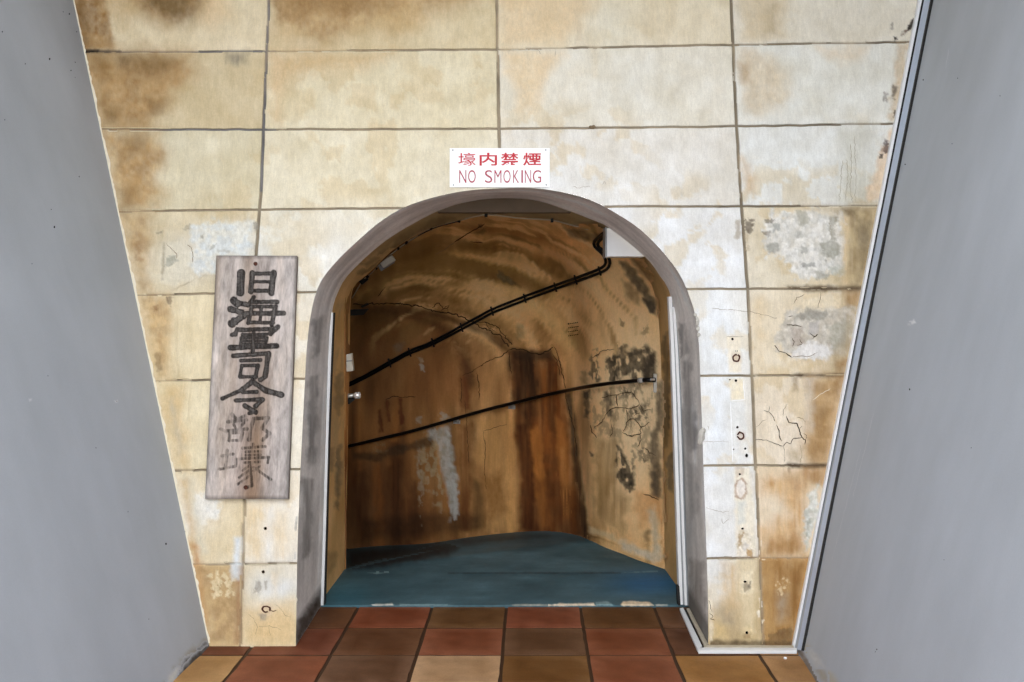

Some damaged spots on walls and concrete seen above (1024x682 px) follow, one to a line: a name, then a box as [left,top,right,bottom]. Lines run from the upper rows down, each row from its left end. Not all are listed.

water stain [74,0,604,474]
peeling [757,207,841,283]
crack [354,290,566,389]
peeling [771,294,845,363]
crack [590,392,656,456]
crack [756,404,807,462]
water stain [330,409,562,549]
water stain [327,548,339,578]